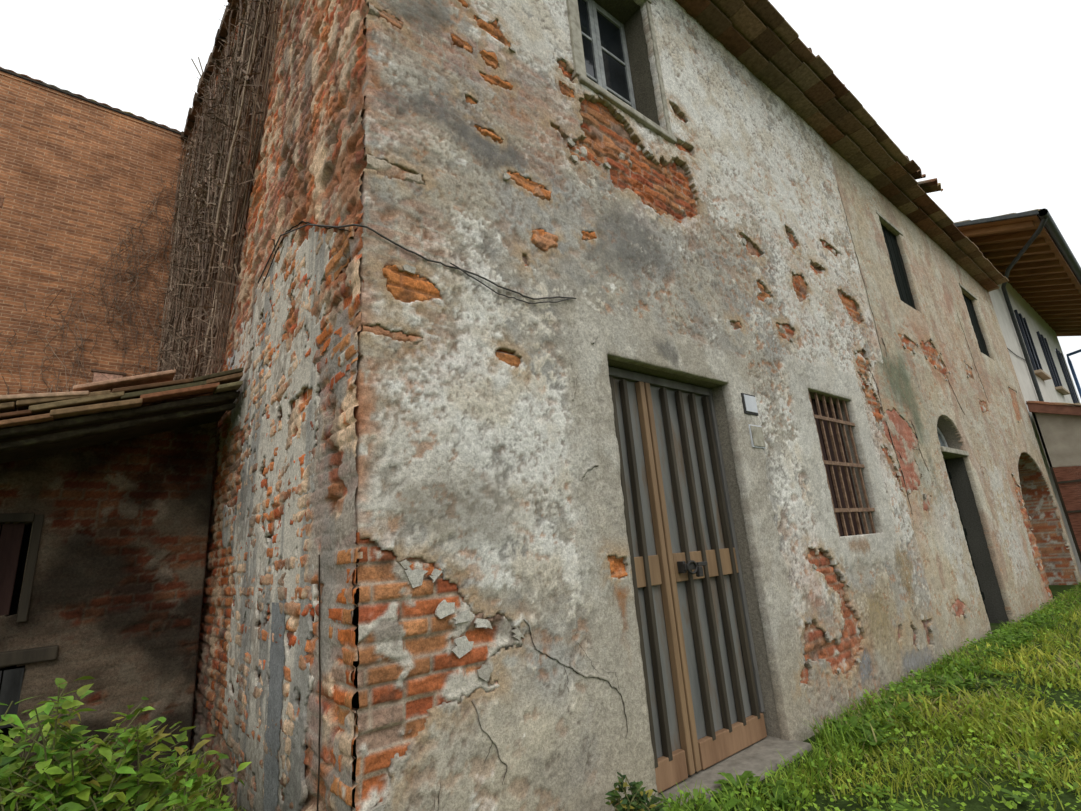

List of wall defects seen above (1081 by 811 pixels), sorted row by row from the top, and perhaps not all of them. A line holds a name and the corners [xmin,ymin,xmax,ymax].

flaking render [451,0,516,90]
flaking render [503,171,552,201]
flaking render [531,229,558,251]
flaking render [550,60,698,223]
flaking render [898,334,951,381]
peeling [853,347,932,512]
peeling [204,221,525,811]
flaking render [608,556,628,579]
flaking render [800,548,863,684]
flaking render [1012,472,1053,599]
crack [523,618,629,738]
crack [471,699,509,785]